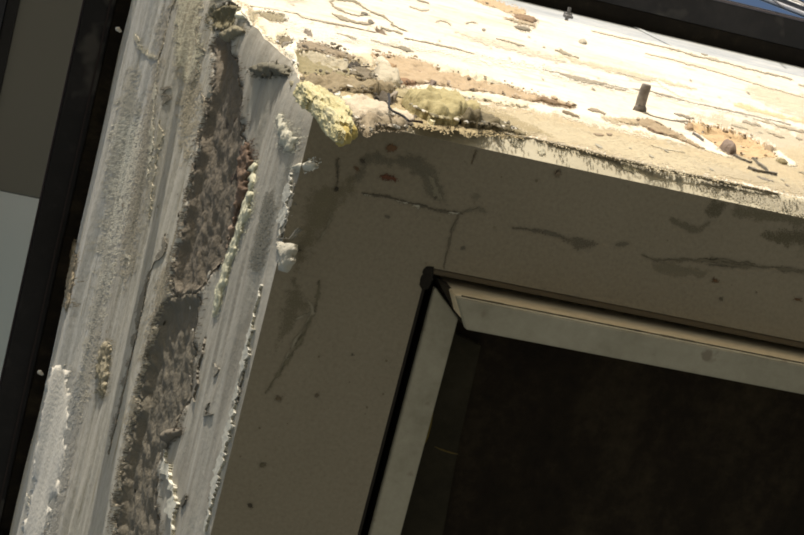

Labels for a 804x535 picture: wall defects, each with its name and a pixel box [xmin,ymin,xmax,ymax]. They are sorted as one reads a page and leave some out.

crack [496,38,525,46]
crack [133,0,478,220]
spalling [612,115,799,168]
crack [279,182,302,252]
spalling [105,0,580,535]
crack [363,193,487,271]
crack [512,226,565,239]
crack [642,255,804,273]
spalling [92,338,116,401]
crack [106,233,169,455]